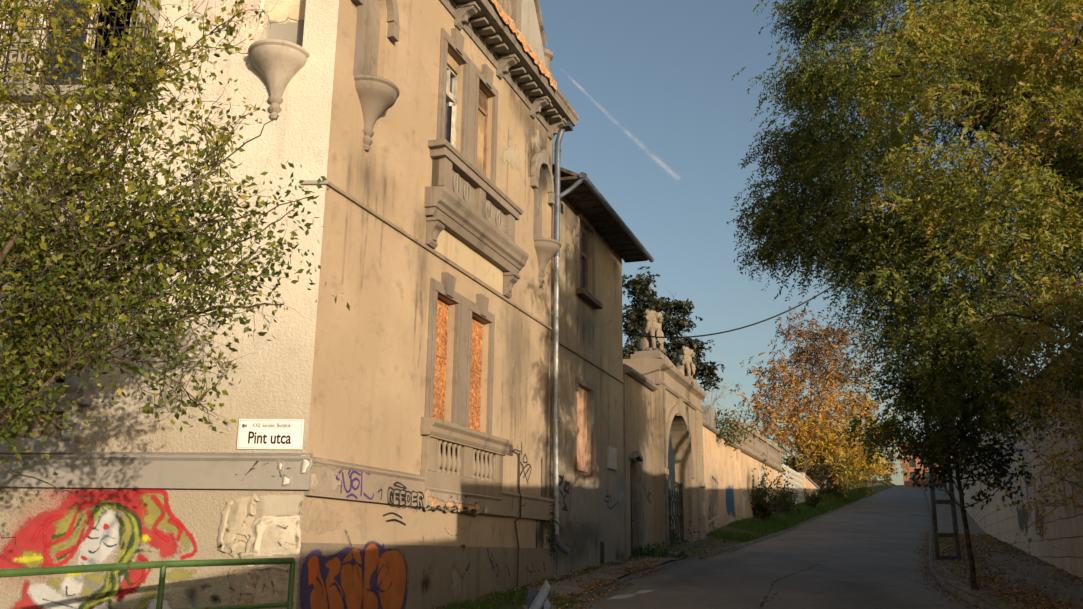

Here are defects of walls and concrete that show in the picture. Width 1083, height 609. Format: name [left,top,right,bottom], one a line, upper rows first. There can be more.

spalling [188,0,306,53]
damp [527,118,546,180]